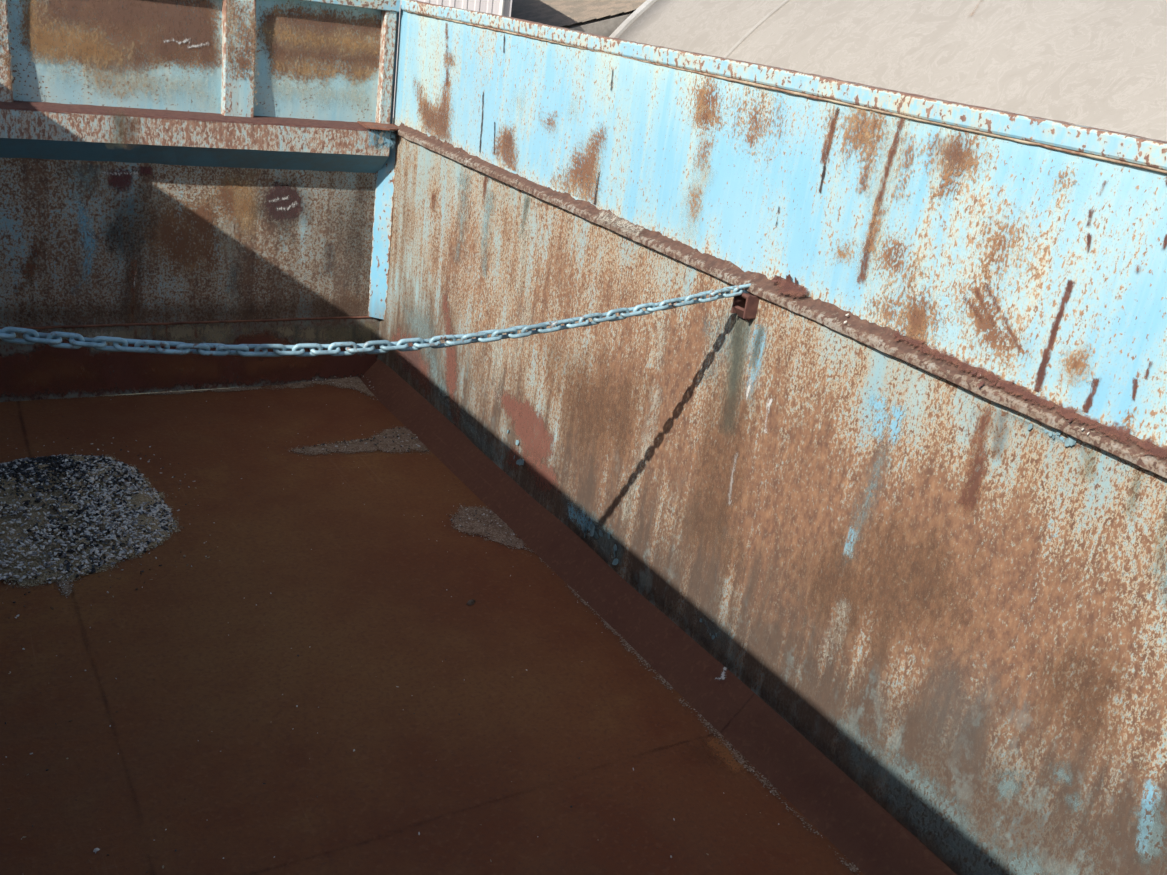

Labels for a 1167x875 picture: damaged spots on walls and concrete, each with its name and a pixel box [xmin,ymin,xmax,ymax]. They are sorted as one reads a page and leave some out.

rust [0,0,381,104]
rust [266,182,303,221]
rust [492,121,519,173]
rust [550,122,607,207]
rust [686,74,788,222]
rust [824,105,992,347]
rust [972,200,1047,289]
rust [1048,162,1079,208]
rust [0,330,377,399]
rust [392,285,461,427]
rust [1059,344,1095,385]
rust [957,405,993,515]